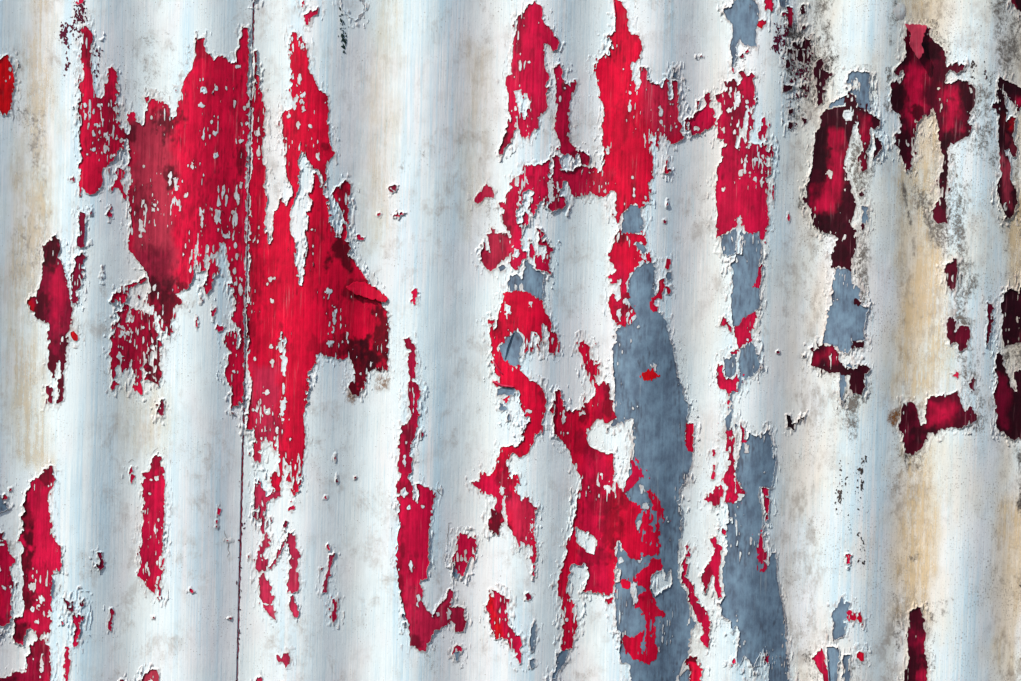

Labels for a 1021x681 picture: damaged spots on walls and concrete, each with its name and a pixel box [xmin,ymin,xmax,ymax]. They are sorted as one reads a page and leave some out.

peeling [1002,0,1021,21]
peeling [374,209,407,221]
peeling [386,182,401,197]
peeling [988,69,1021,226]
peeling [24,204,106,412]
peeling [67,0,397,630]
peeling [389,0,983,681]
peeling [892,270,1021,461]
peeling [0,459,118,681]
peeling [117,662,162,681]
peeling [250,645,296,681]